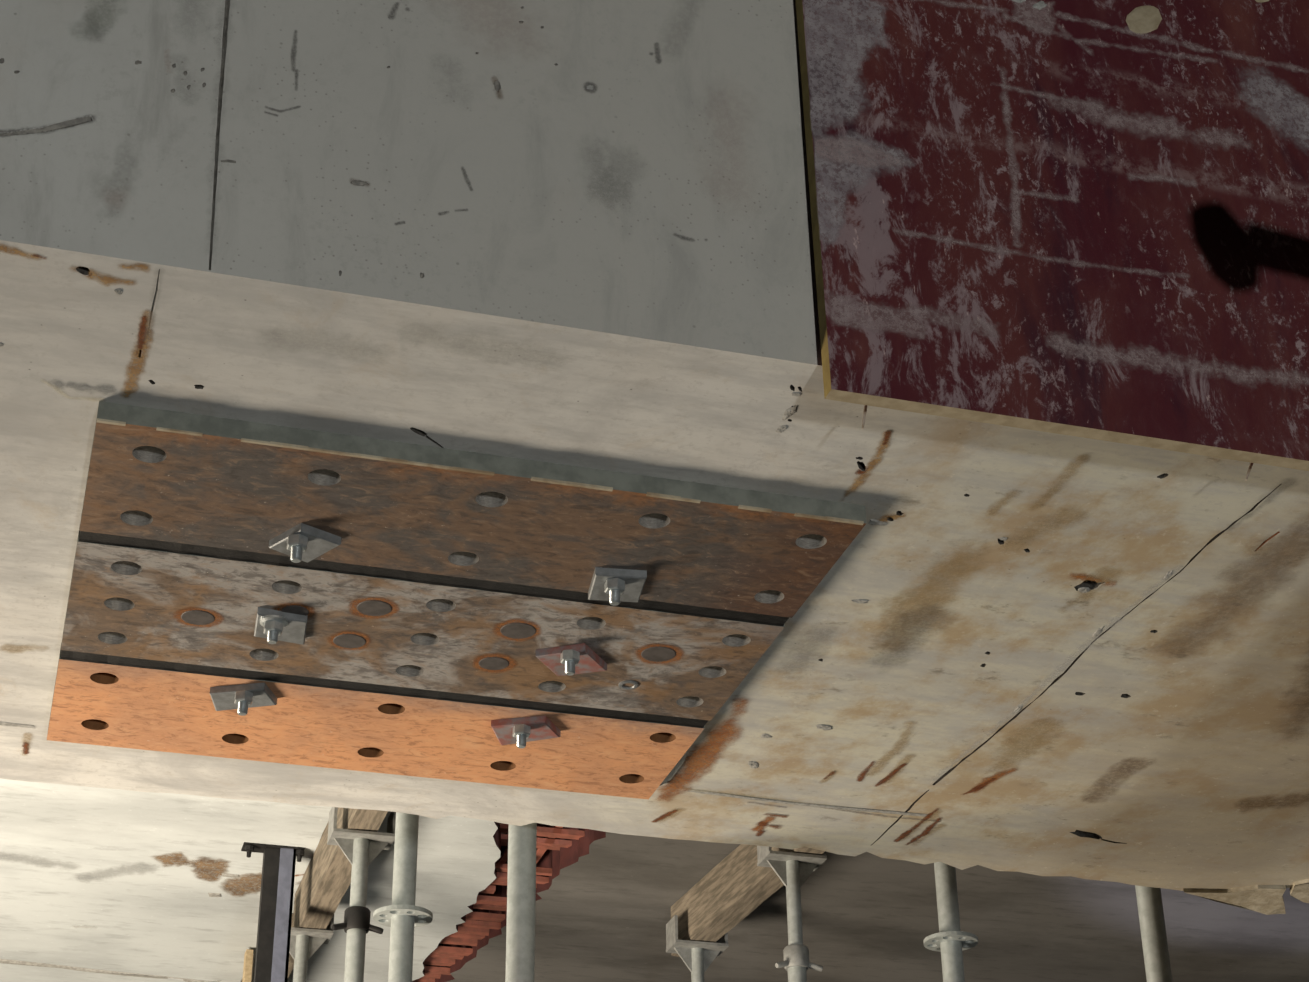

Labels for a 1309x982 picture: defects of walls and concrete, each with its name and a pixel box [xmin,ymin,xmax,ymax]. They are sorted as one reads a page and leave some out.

rust [124,311,152,397]
rust [274,603,313,616]
crack [872,484,1281,845]
rust [652,699,746,822]
rust [857,762,906,787]
rust [963,769,1015,795]
rust [894,810,941,845]